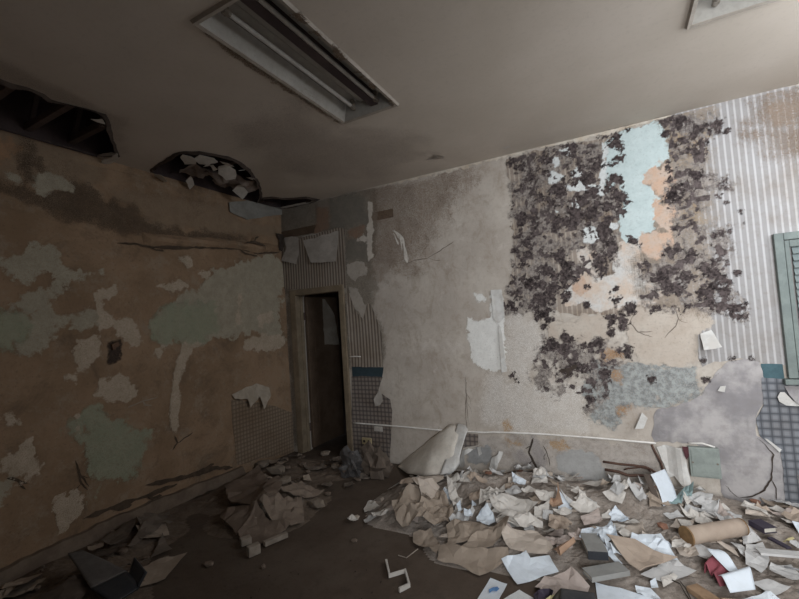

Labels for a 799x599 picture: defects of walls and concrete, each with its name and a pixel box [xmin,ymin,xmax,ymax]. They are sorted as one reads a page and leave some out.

flaking render [180,155,282,220]
crack [120,236,279,257]
peeling [346,201,374,319]
peeling [532,115,717,368]
peeling [0,240,146,403]
peeling [466,289,507,372]
flaking render [169,339,207,433]
flaking render [0,436,45,507]
flaking render [51,488,86,535]
crack [725,438,777,500]